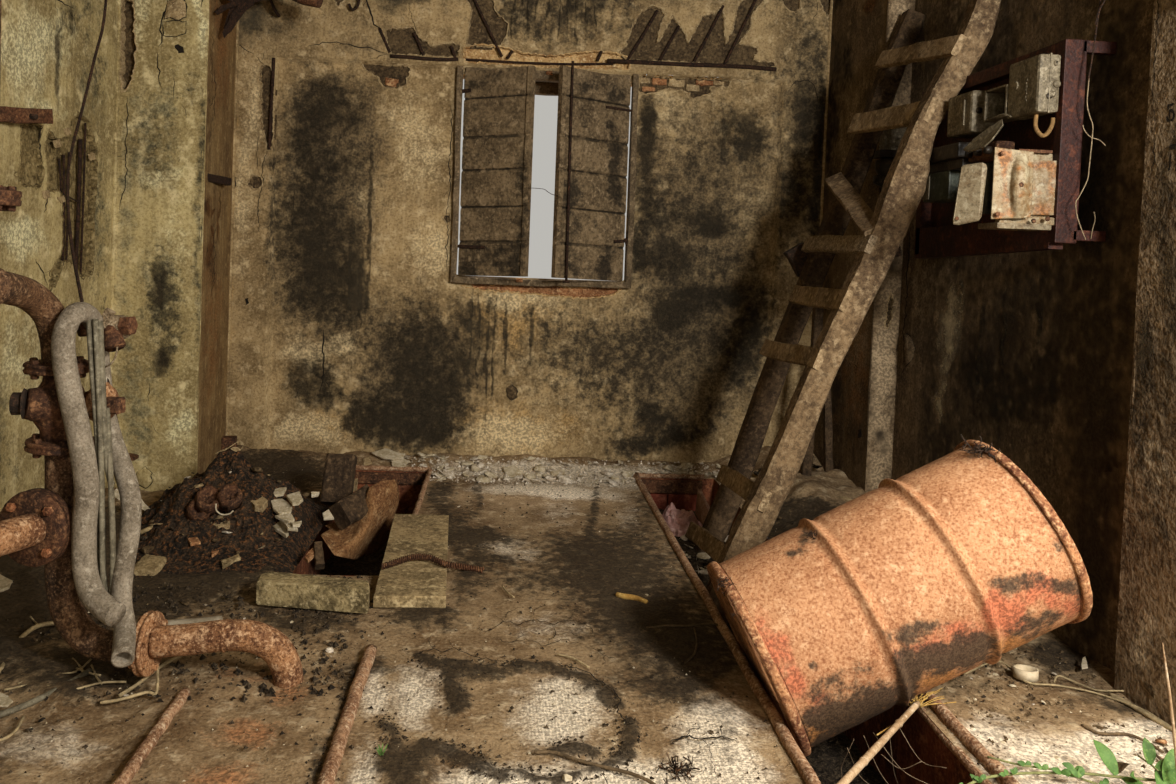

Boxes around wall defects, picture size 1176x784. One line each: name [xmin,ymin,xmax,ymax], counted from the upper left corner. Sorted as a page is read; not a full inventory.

spalling [119,0,138,92]
crack [157,0,264,118]
damp [510,0,597,39]
spalling [362,0,777,99]
spalling [781,0,801,14]
crack [117,97,129,210]
damp [279,84,374,326]
damp [635,99,684,274]
damp [720,115,764,158]
damp [288,362,342,405]
damp [349,301,508,443]